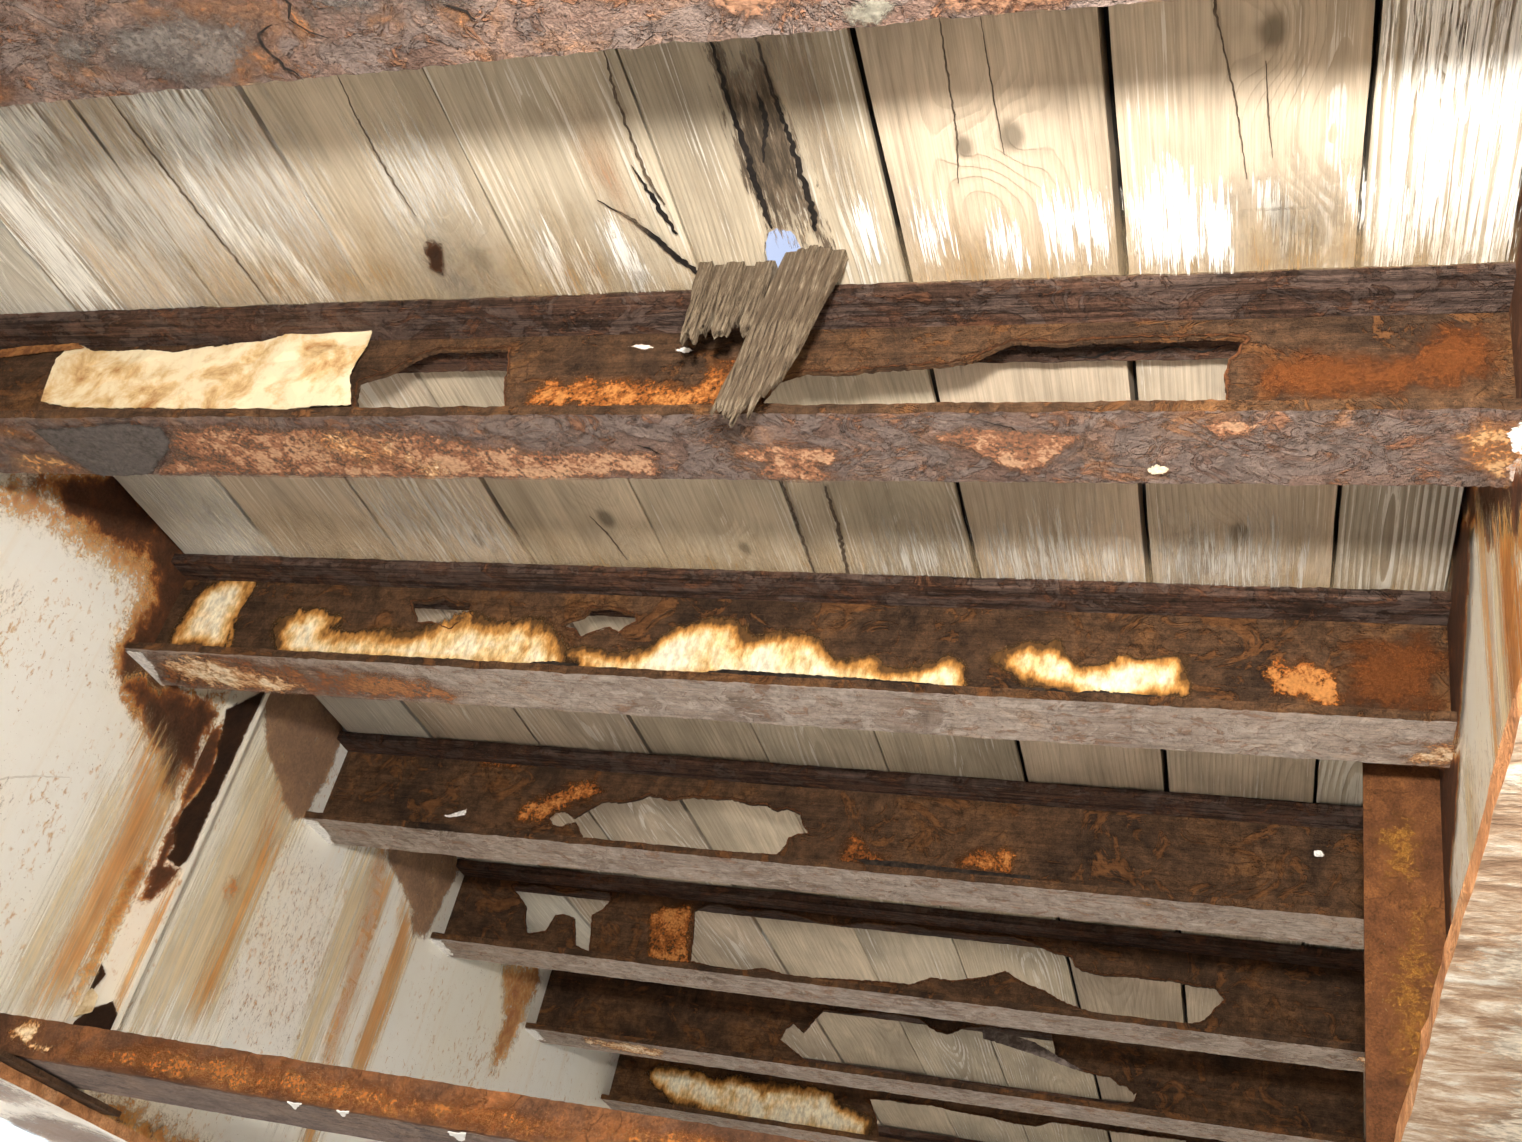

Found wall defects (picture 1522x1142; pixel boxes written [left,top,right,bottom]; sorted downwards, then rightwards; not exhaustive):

crack [597,50,697,274]
crack [705,37,836,249]
peeling [41,331,372,409]
rust [523,359,736,406]
rust [159,424,664,480]
rust [931,426,1084,475]
peeling [168,580,257,647]
peeling [272,607,968,686]
peeling [989,639,1192,698]
rust [1263,459,1522,938]
rust [0,428,564,1142]
peeling [583,1037,875,1135]